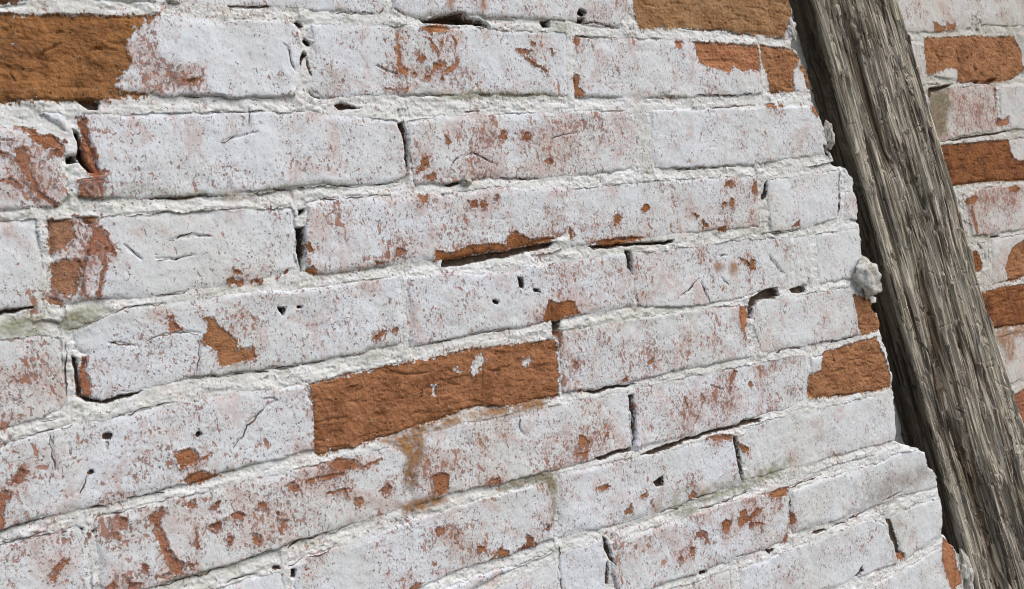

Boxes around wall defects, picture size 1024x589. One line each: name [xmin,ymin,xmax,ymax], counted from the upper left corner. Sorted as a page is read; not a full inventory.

spalling [633,0,818,117]
spalling [924,21,1024,104]
spalling [0,0,161,308]
peeling [433,230,555,263]
peeling [588,214,643,247]
spalling [941,139,1024,235]
spalling [982,240,1024,329]
peeling [200,316,258,367]
spalling [807,293,892,400]
spalling [284,299,580,509]
peeling [942,537,962,589]